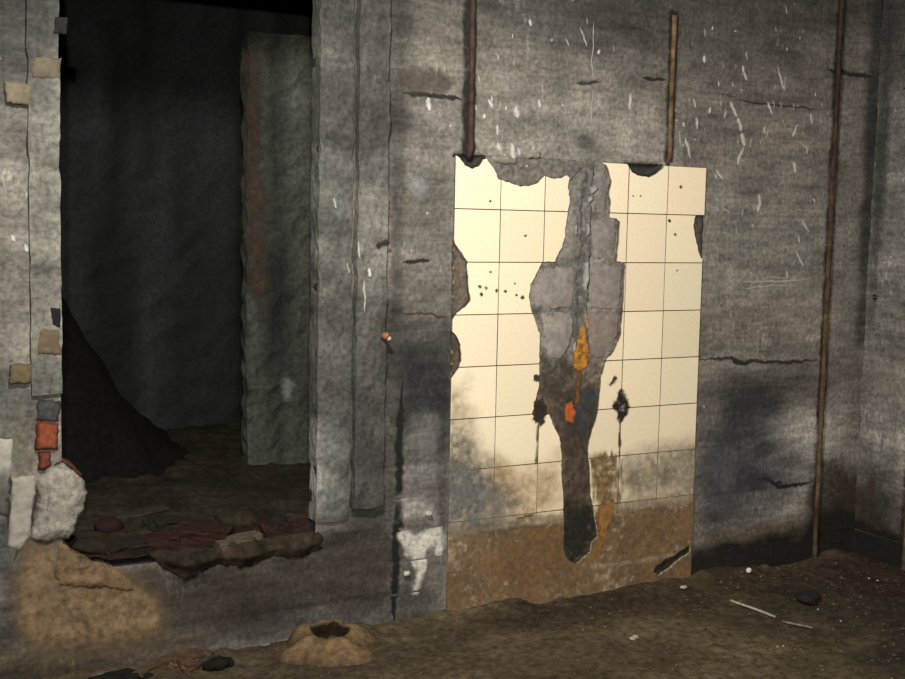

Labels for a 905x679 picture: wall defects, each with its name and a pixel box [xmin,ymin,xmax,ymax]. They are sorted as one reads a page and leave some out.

peeling [475,96,520,119]
crack [828,69,873,78]
spalling [50,308,61,327]
spalling [450,125,624,563]
corrosion [565,315,589,423]
crack [699,356,818,365]
damp [610,376,630,455]
flaking render [0,399,82,551]
damp [397,388,903,611]